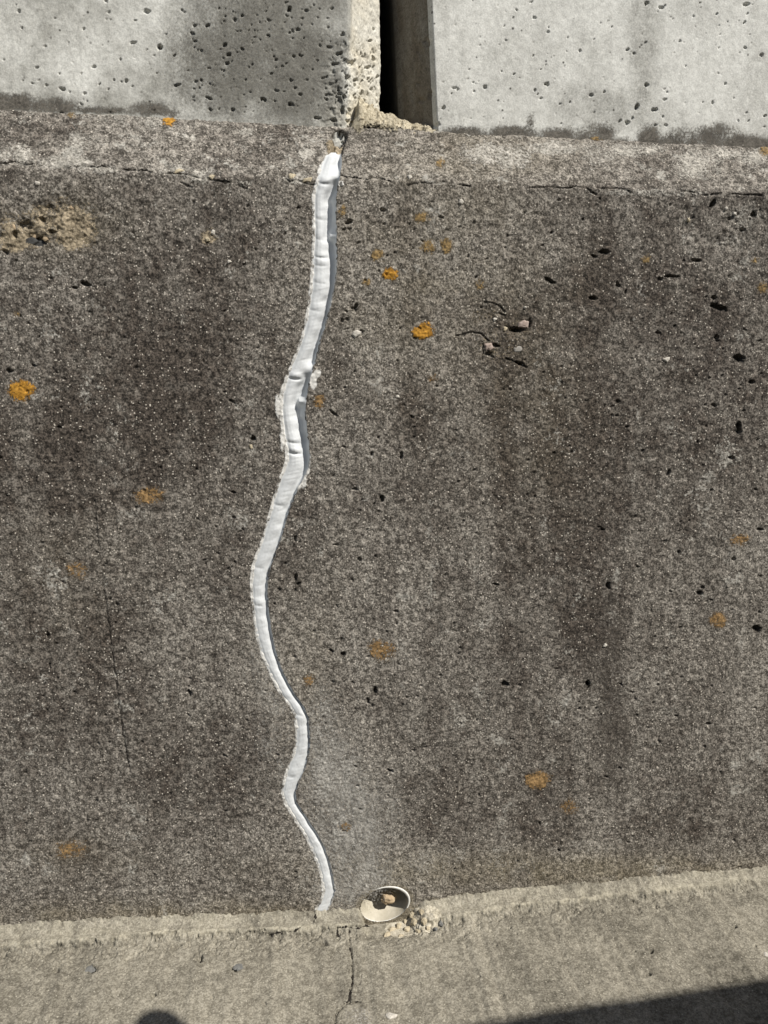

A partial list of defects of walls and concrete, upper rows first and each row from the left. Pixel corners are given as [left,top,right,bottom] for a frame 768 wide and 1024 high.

crack [68,165,244,188]
crack [250,131,470,1024]